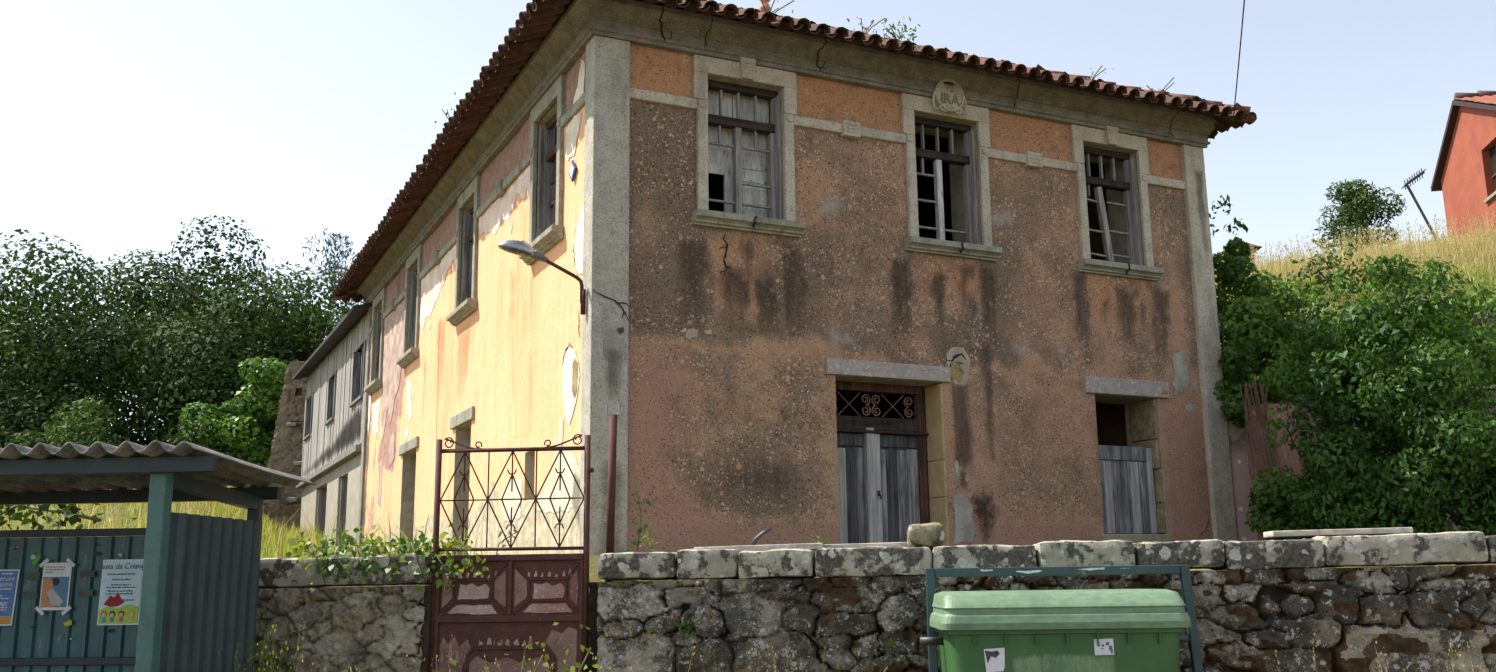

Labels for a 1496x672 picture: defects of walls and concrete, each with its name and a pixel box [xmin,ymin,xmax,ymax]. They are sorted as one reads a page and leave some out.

flaking render [479,166,530,236]
damp [934,275,943,309]
damp [953,386,970,484]
damp [975,497,994,537]